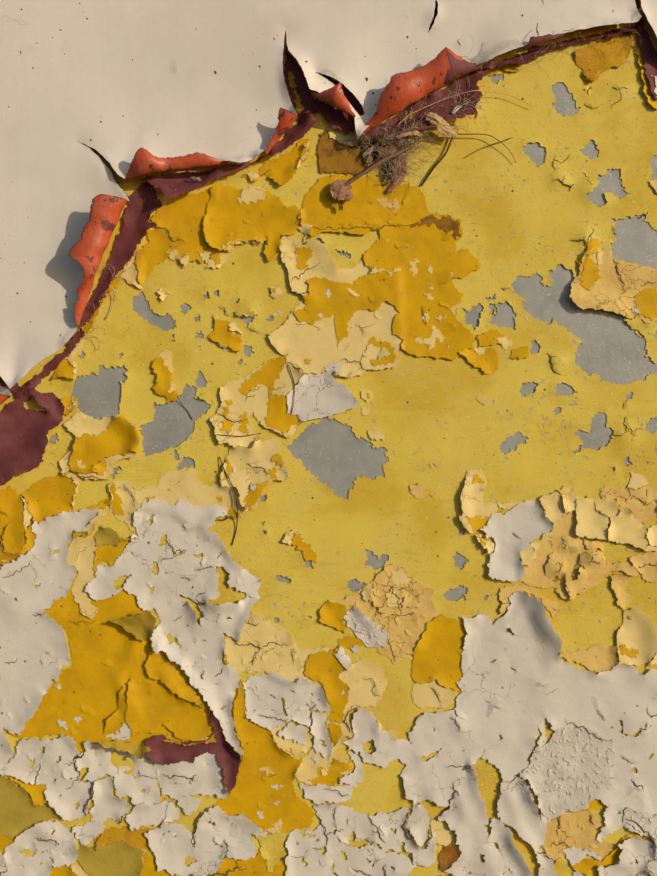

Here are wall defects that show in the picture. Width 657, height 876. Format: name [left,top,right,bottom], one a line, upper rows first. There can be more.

peeling [0,0,657,455]
peeling [0,181,241,874]
peeling [1,439,657,876]
peeling [287,418,389,499]